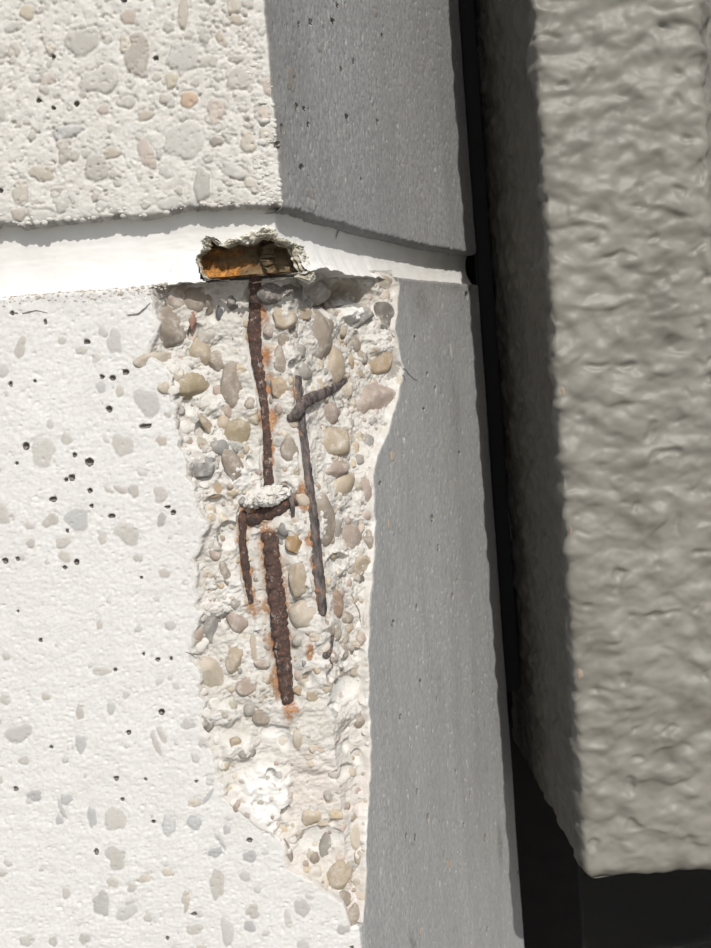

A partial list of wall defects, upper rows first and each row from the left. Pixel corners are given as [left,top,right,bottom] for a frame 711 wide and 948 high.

rust [199,248,284,279]
rust [261,348,273,394]
rust [258,409,277,432]
spalling [2,270,404,926]
rust [236,507,275,616]
rust [268,634,299,719]